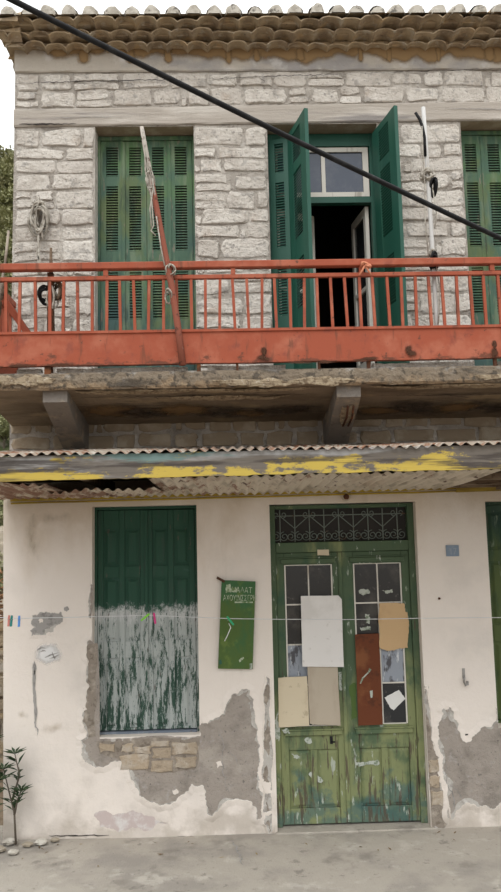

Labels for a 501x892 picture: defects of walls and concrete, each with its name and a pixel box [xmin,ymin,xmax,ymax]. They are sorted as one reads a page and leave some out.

peeling [27,605,70,639]
peeling [75,634,277,836]
peeling [423,685,501,829]